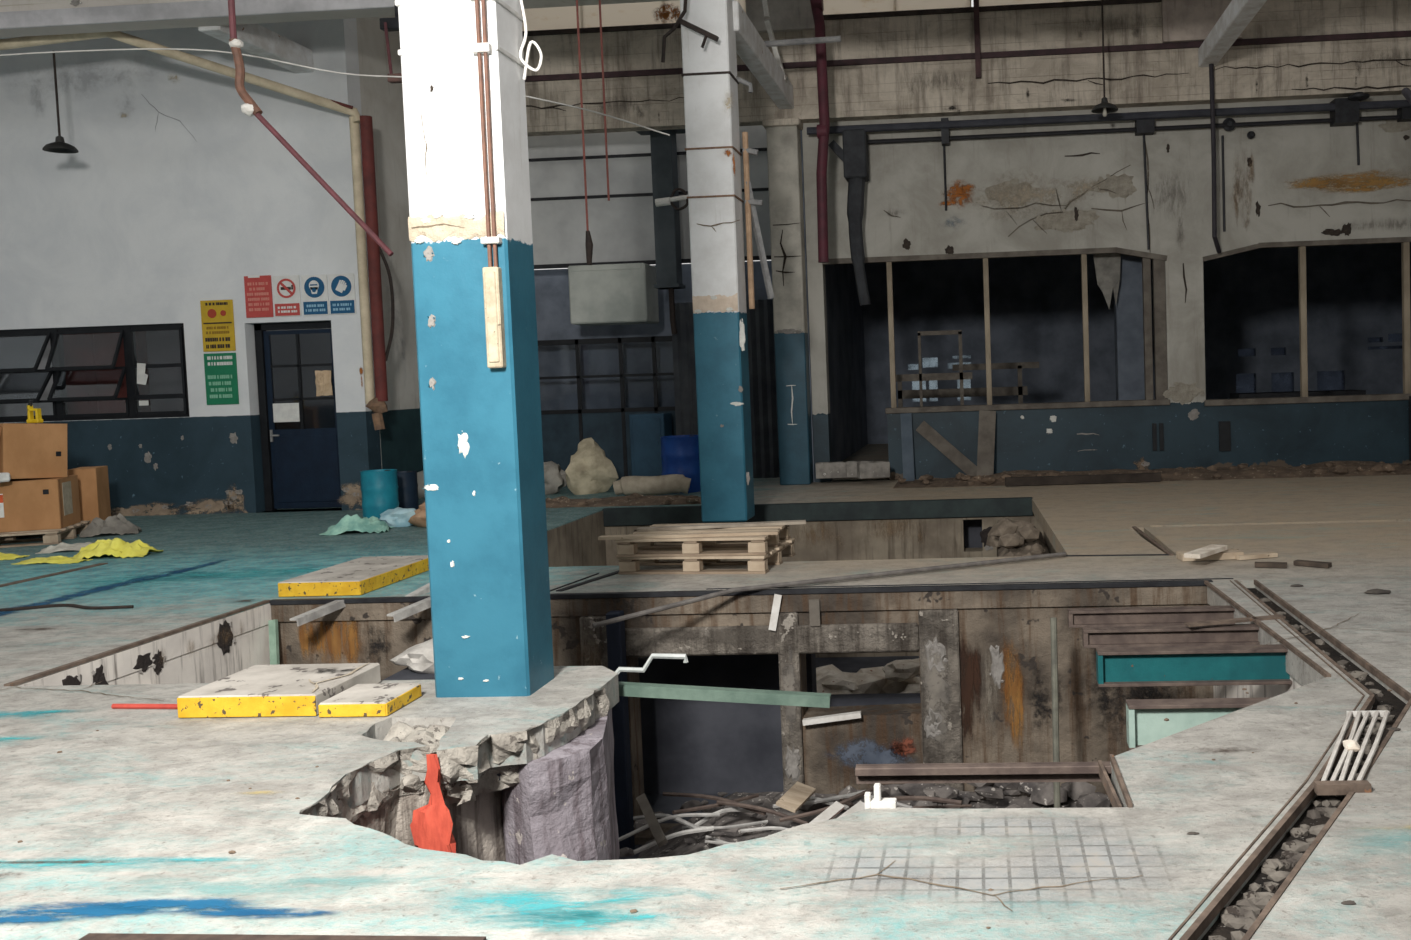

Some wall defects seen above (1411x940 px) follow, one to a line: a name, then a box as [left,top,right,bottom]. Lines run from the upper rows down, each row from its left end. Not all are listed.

crack [983,142,1154,239]
peeling [408,210,505,262]
peeling [457,431,470,457]
peeling [110,487,244,516]
rust [1003,648,1023,738]